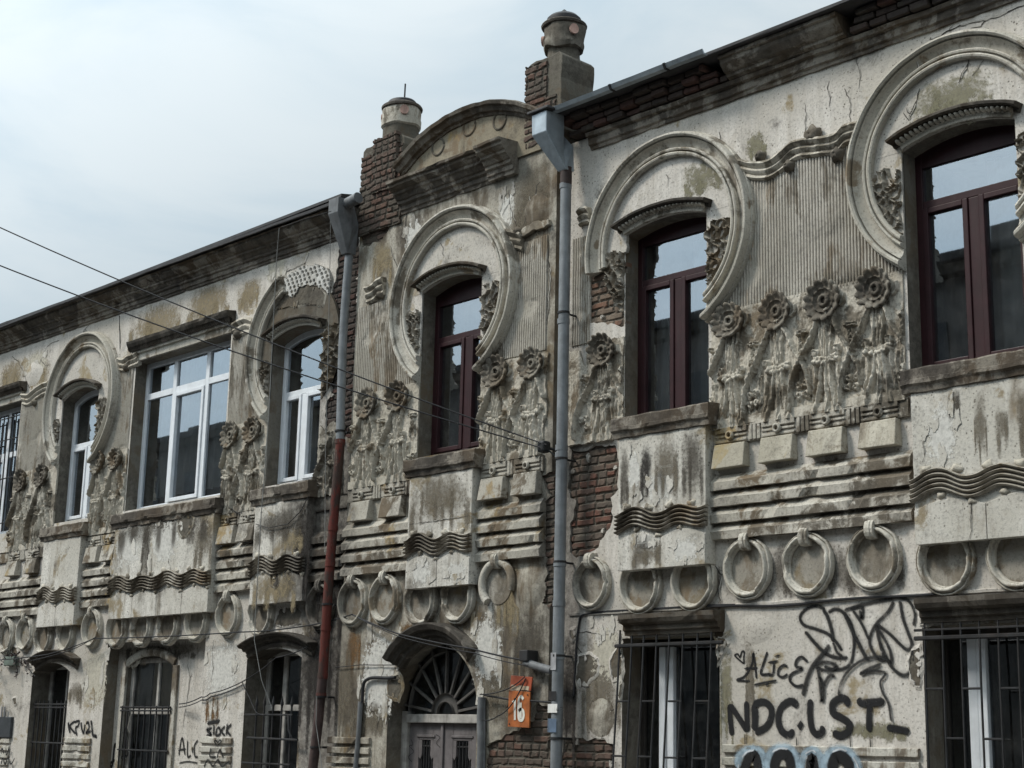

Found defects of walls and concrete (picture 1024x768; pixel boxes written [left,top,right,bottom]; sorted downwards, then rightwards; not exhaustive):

crack [804,58,861,130]
flaking render [264,227,389,438]
flaking render [590,272,631,327]
water stain [974,398,1024,462]
flaking render [569,441,673,557]
water stain [621,434,703,504]
water stain [118,516,212,574]
water stain [632,543,660,568]
peeling [568,611,625,704]